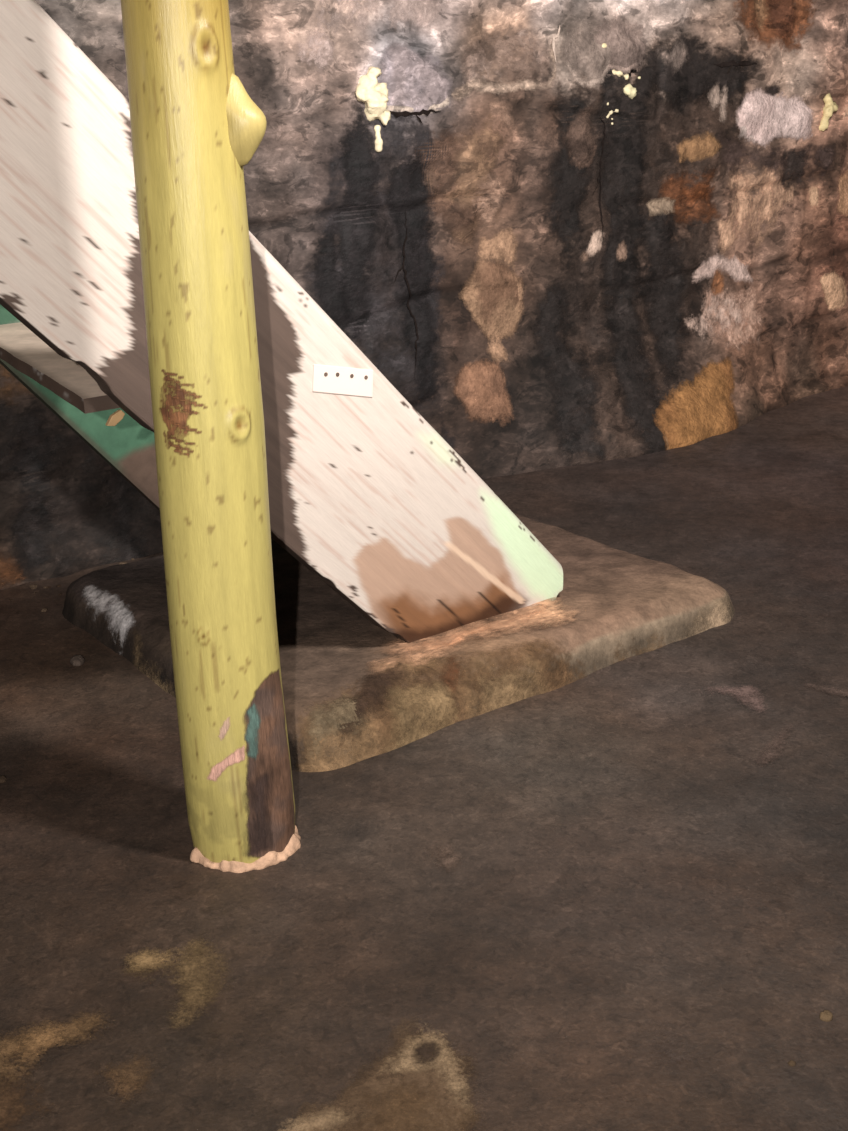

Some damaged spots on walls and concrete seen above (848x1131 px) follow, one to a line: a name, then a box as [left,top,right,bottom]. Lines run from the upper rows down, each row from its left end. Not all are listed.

leakage [307,104,444,409]
leakage [531,30,835,465]
leakage [838,172,848,215]
spalling [244,639,584,858]